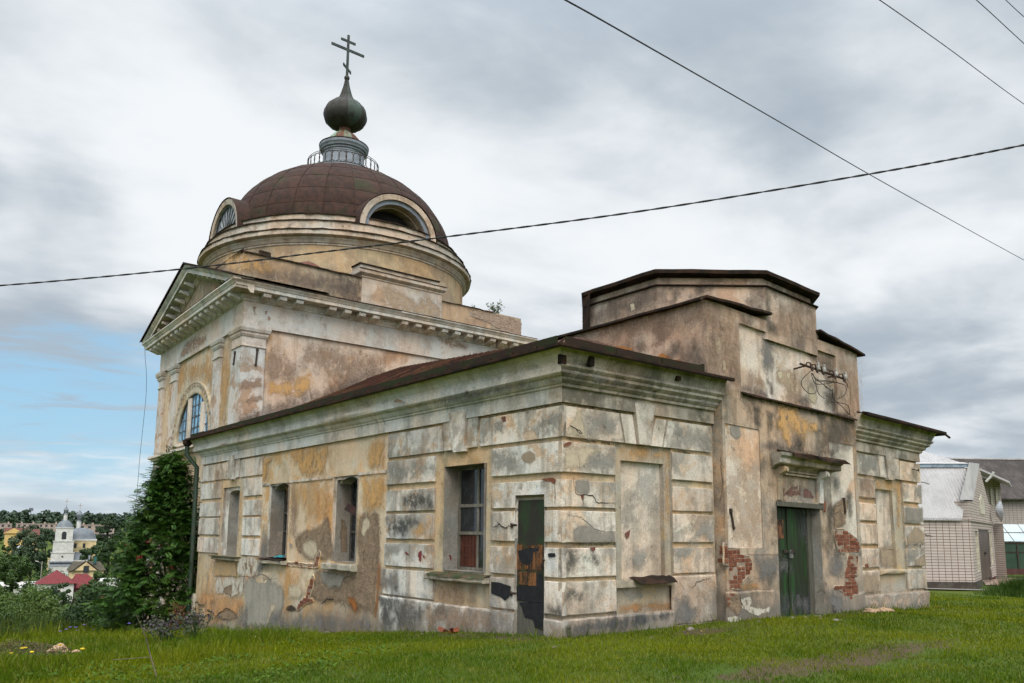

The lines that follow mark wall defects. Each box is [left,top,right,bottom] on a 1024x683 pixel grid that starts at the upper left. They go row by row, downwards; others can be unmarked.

flaking render [199,556,261,622]
spalling [285,439,384,614]
damp [267,570,473,631]
crack [554,466,633,532]
flaking render [717,542,770,622]
flaking render [783,479,926,609]